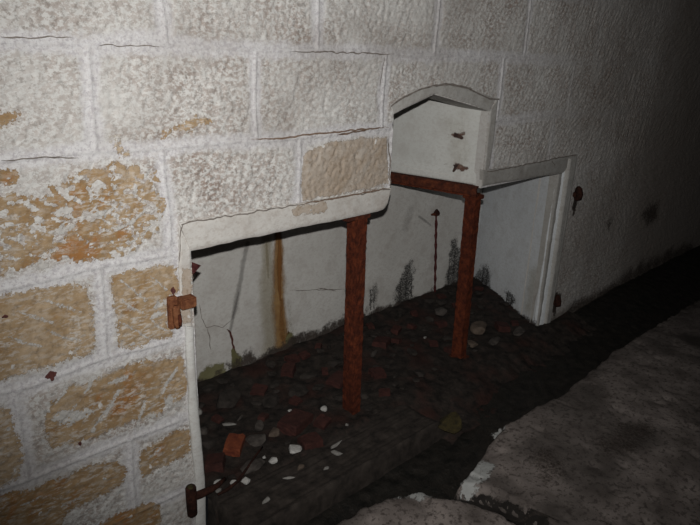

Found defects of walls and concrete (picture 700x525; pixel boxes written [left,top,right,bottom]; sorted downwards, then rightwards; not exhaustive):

peeling [0,131,166,277]
peeling [292,136,389,216]
peeling [0,281,96,381]
peeling [111,264,194,350]
crack [199,305,235,350]
rust [273,232,288,349]
leakage [216,318,345,374]
leakage [364,260,416,316]
leakage [445,239,460,286]
peeling [43,356,187,449]
peeling [0,408,127,525]
peeling [139,429,191,478]